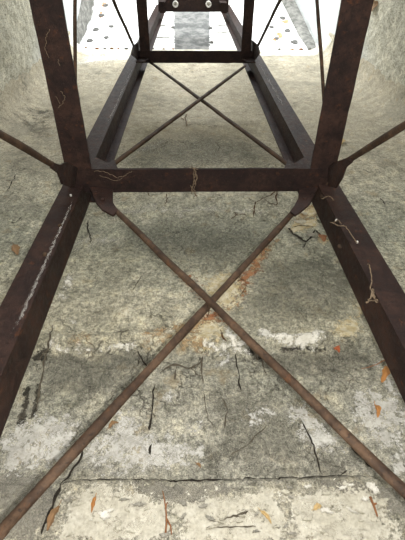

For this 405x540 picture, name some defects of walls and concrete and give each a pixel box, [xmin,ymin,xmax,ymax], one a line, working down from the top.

crack [288,225,320,248]
corrosion [223,239,278,310]
water stain [202,323,250,367]
water stain [258,300,363,349]
crack [147,386,155,430]
crack [41,421,371,534]